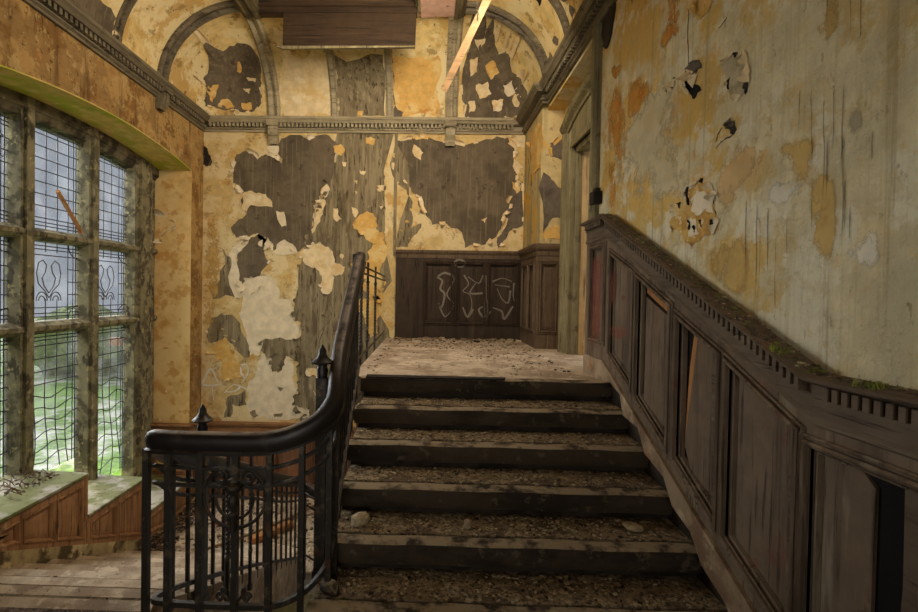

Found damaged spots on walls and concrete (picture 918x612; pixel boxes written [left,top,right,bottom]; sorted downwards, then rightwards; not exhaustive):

peeling [193,28,263,113]
peeling [273,27,442,117]
peeling [459,14,528,120]
spalling [674,60,702,99]
spalling [719,50,750,102]
peeling [203,144,212,166]
flaking render [617,83,719,248]
spalling [723,118,737,135]
water stain [768,88,862,258]
flaking render [205,122,562,421]